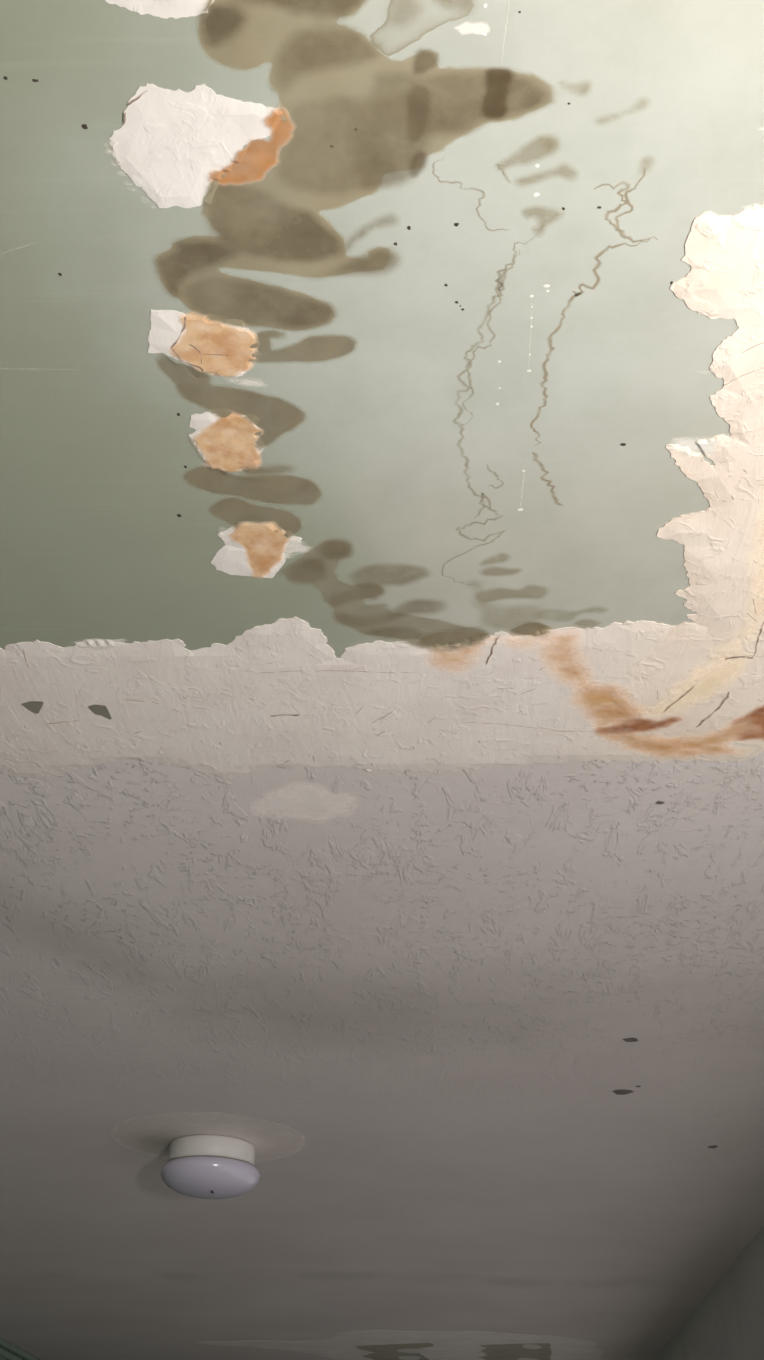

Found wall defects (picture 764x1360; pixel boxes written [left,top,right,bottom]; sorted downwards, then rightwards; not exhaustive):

leakage [157,0,555,390]
leakage [158,356,305,449]
leakage [184,466,321,538]
leakage [461,460,546,601]
leakage [282,541,489,649]
leakage [511,622,550,636]
crack [725,623,764,660]
spalling [21,701,43,729]
spalling [88,705,112,719]
corrosion [548,637,764,755]
crack [664,686,729,728]